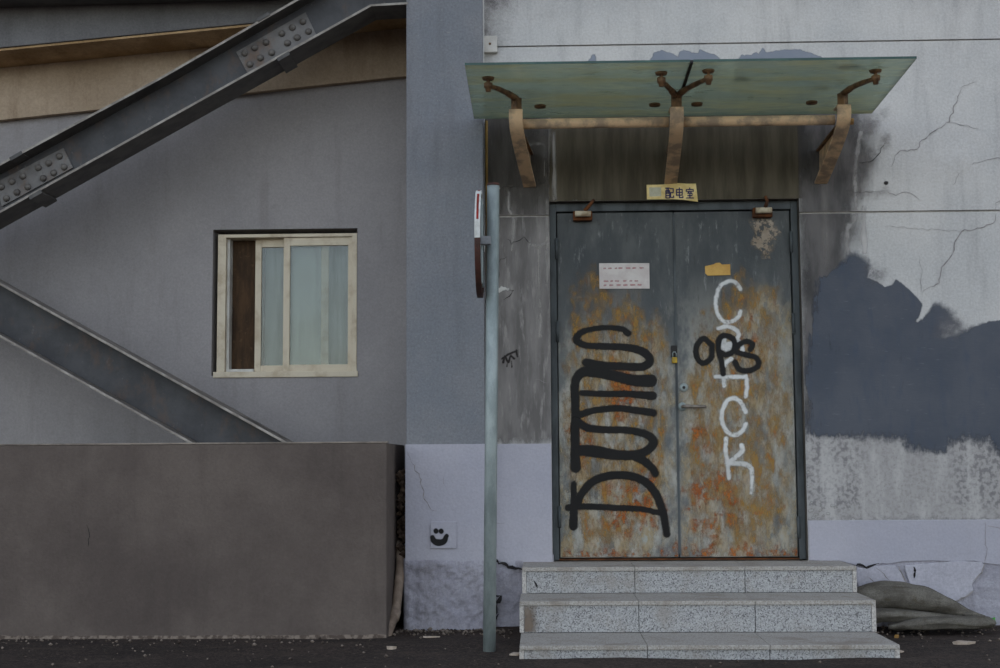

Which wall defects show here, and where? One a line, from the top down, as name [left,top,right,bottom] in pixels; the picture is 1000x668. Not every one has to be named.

peeling [651,50,719,60]
peeling [739,48,822,59]
crack [859,82,974,165]
damp [485,116,678,444]
peeling [750,218,780,259]
damp [677,114,875,426]
crack [892,201,1000,290]
rust [560,273,797,557]
flaking render [805,427,1000,520]
crack [851,563,916,582]